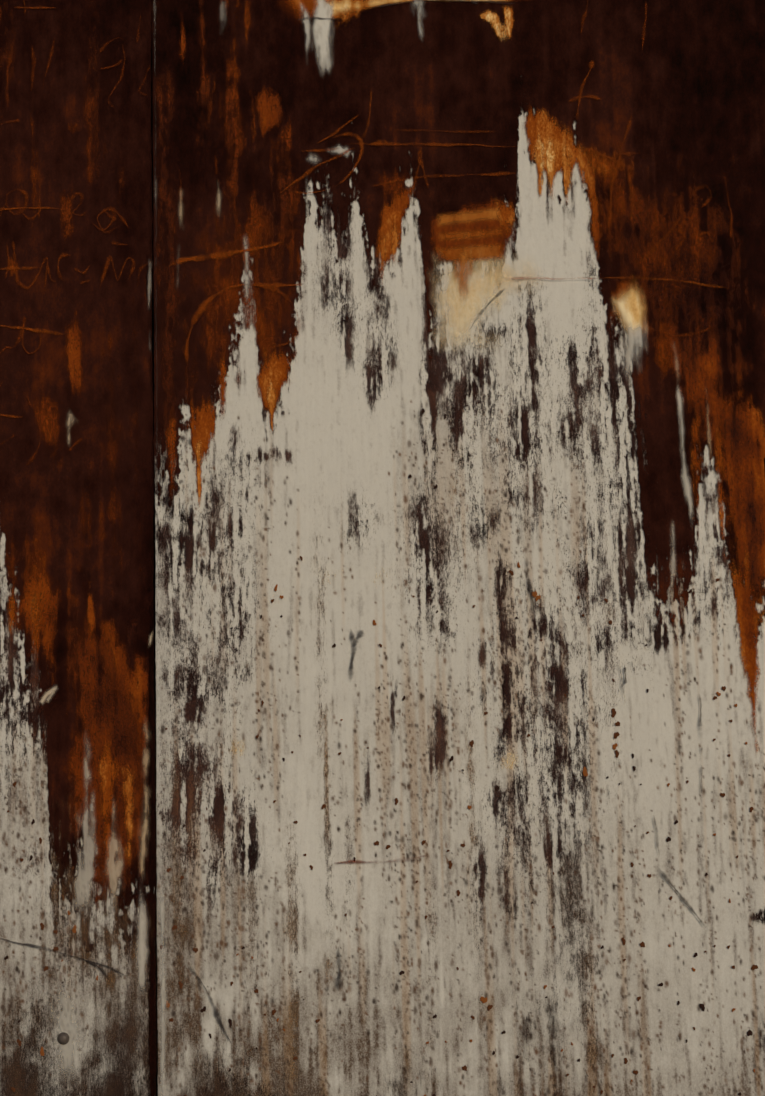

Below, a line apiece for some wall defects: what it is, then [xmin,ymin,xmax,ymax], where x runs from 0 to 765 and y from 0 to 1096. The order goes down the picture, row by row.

corrosion [287,0,410,22]
corrosion [149,0,305,502]
peeling [229,430,292,478]
peeling [320,266,355,366]
peeling [365,335,397,410]
corrosion [430,199,515,288]
peeling [500,284,546,530]
peeling [589,410,606,465]
corrosion [525,109,765,758]
peeling [177,482,224,613]
corrosion [8,554,185,1096]
peeling [109,738,156,987]